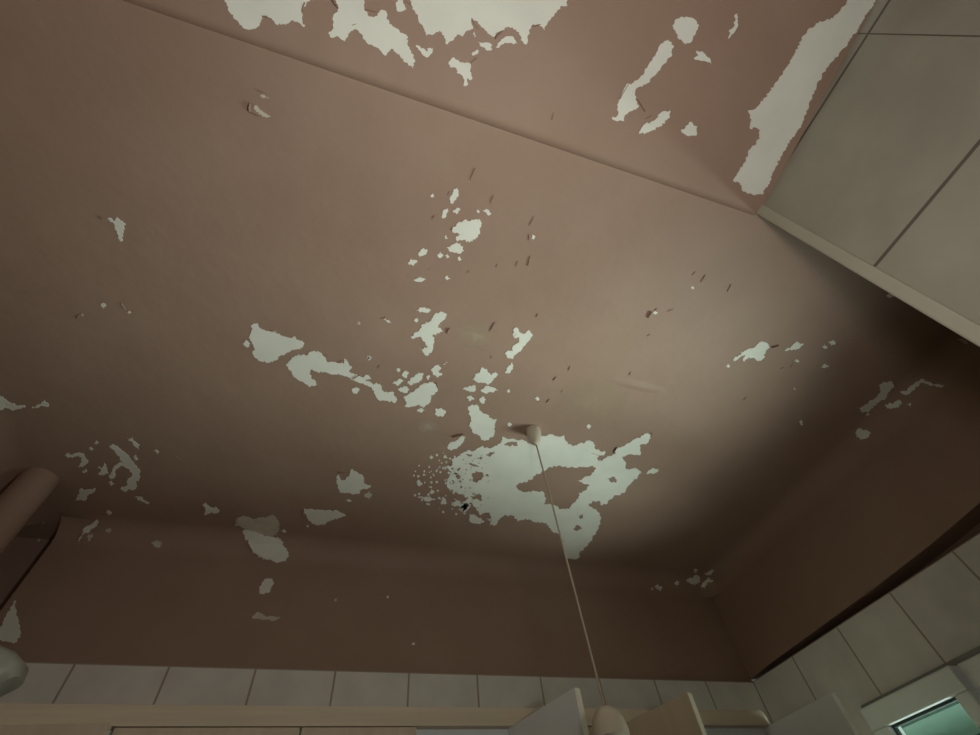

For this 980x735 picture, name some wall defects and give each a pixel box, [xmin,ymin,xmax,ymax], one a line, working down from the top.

peeling [224,0,310,30]
peeling [328,0,567,86]
peeling [612,16,712,136]
peeling [733,0,875,195]
peeling [408,188,494,266]
peeling [243,323,448,417]
peeling [411,306,449,356]
peeling [726,341,804,369]
peeling [65,437,149,504]
peeling [336,469,372,502]
peeling [413,327,658,559]
peeling [234,515,289,563]